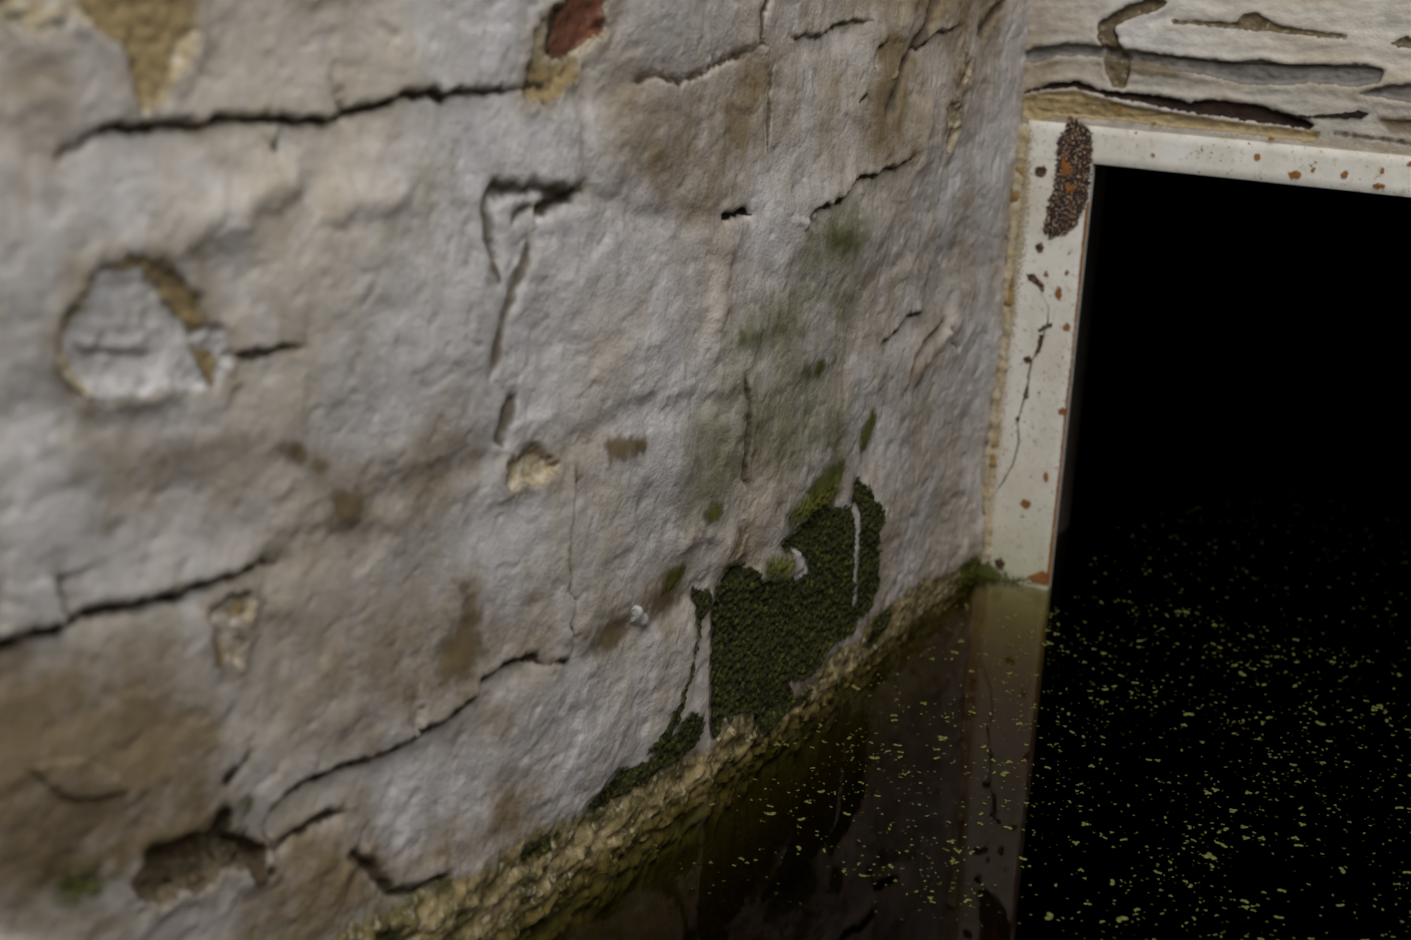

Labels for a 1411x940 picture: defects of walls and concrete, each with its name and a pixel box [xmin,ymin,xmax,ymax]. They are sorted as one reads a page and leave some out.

flaking render [0,0,200,119]
crack [55,86,522,162]
corrosion [1380,117,1411,132]
crack [721,207,752,220]
flaking render [56,254,233,403]
crack [236,345,293,360]
crack [480,181,580,447]
corrosion [994,114,1093,584]
spalling [333,0,1411,940]
crack [0,559,266,648]
crack [262,568,574,849]
flaking render [131,807,277,906]